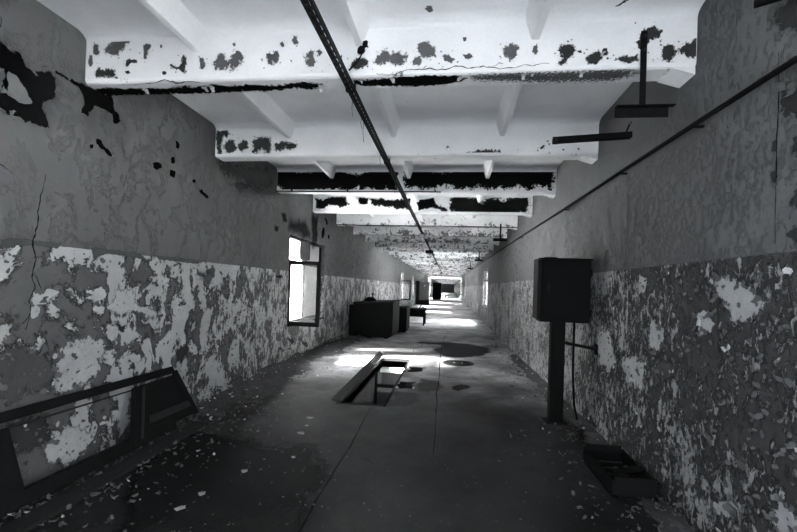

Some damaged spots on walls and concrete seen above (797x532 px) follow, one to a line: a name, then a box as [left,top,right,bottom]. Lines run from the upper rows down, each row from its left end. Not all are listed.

peeling [0,248,327,407]
peeling [2,405,130,470]